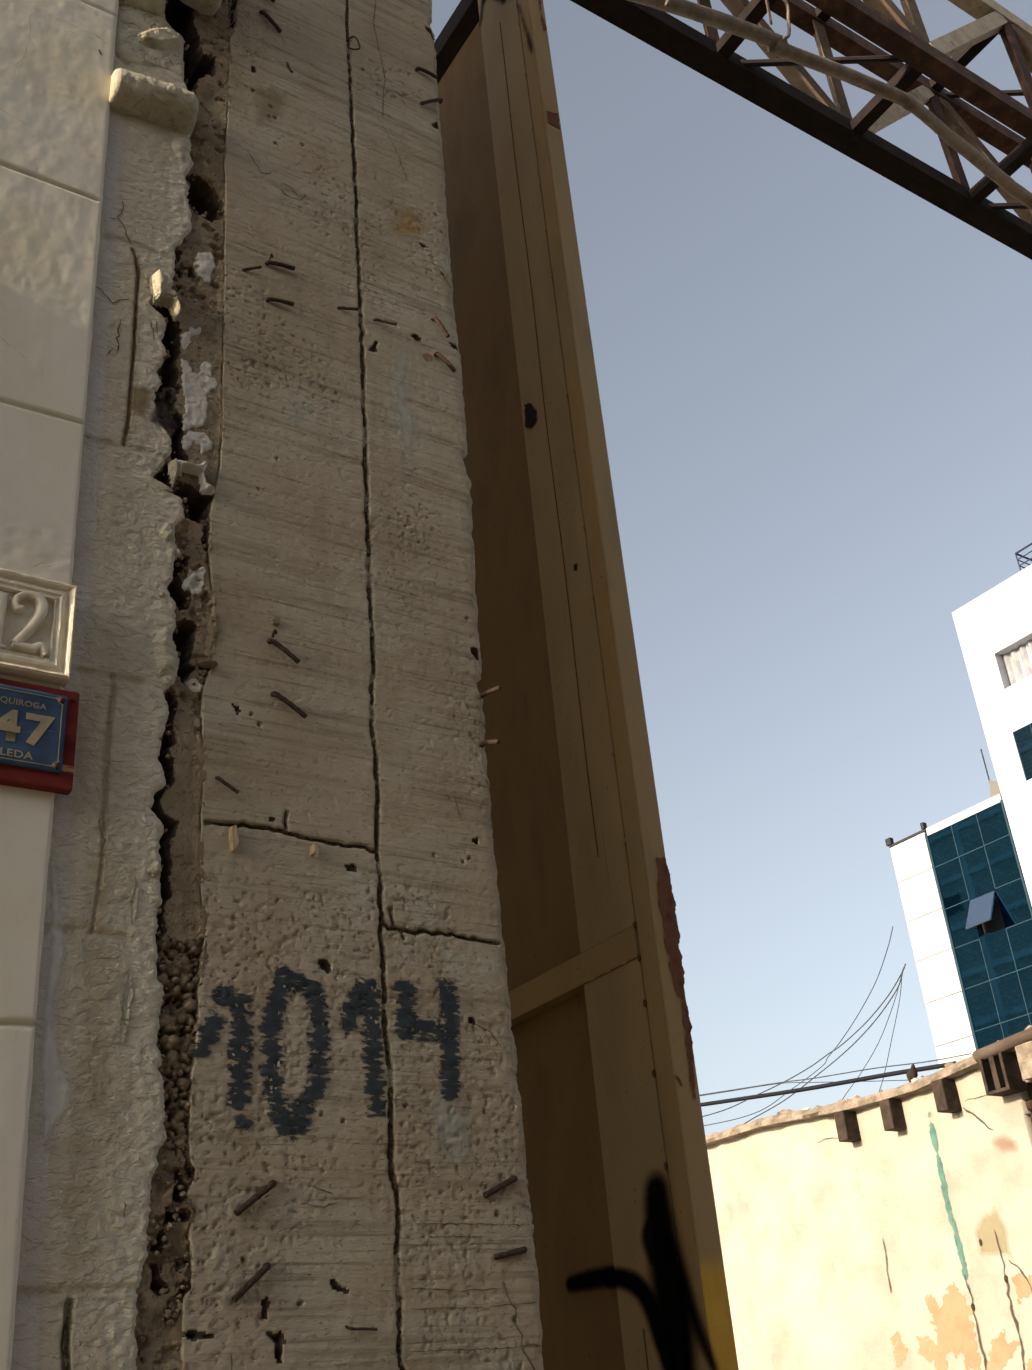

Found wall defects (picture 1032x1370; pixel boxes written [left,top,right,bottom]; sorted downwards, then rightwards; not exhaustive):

hole [164,0,216,92]
hole [185,174,224,223]
crack [207,0,540,1370]
spalling [131,250,214,1320]
spalling [182,1330,214,1342]
peeling [890,1282,1032,1370]
crack [964,1275,987,1370]
crack [994,1231,1032,1370]
peeling [1010,1273,1032,1304]